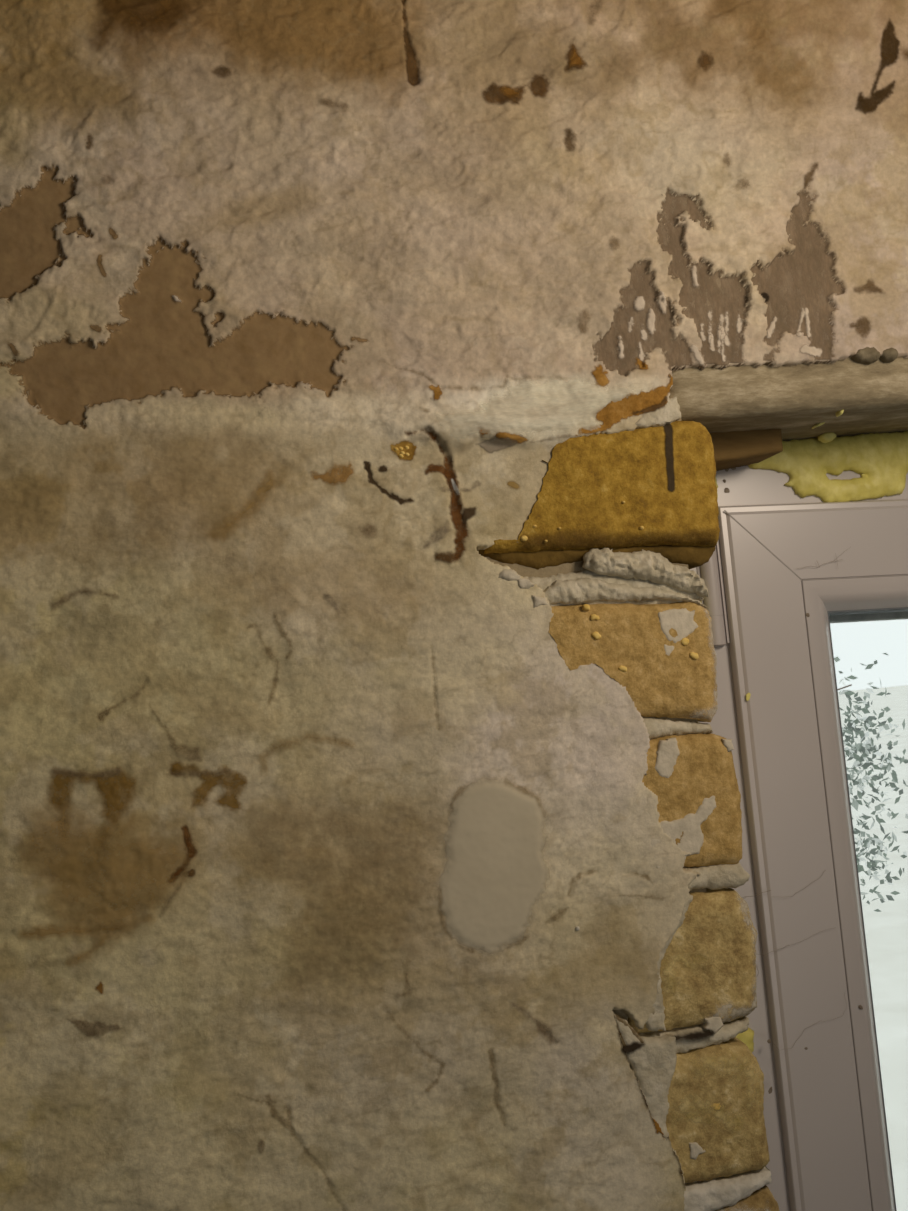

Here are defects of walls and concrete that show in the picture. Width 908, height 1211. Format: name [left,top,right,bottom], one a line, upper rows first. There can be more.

peeling [0,165,93,303]
peeling [0,237,368,429]
flaking render [549,164,882,440]
spalling [478,427,528,453]
leakage [23,820,185,944]
spalling [616,1015,644,1053]